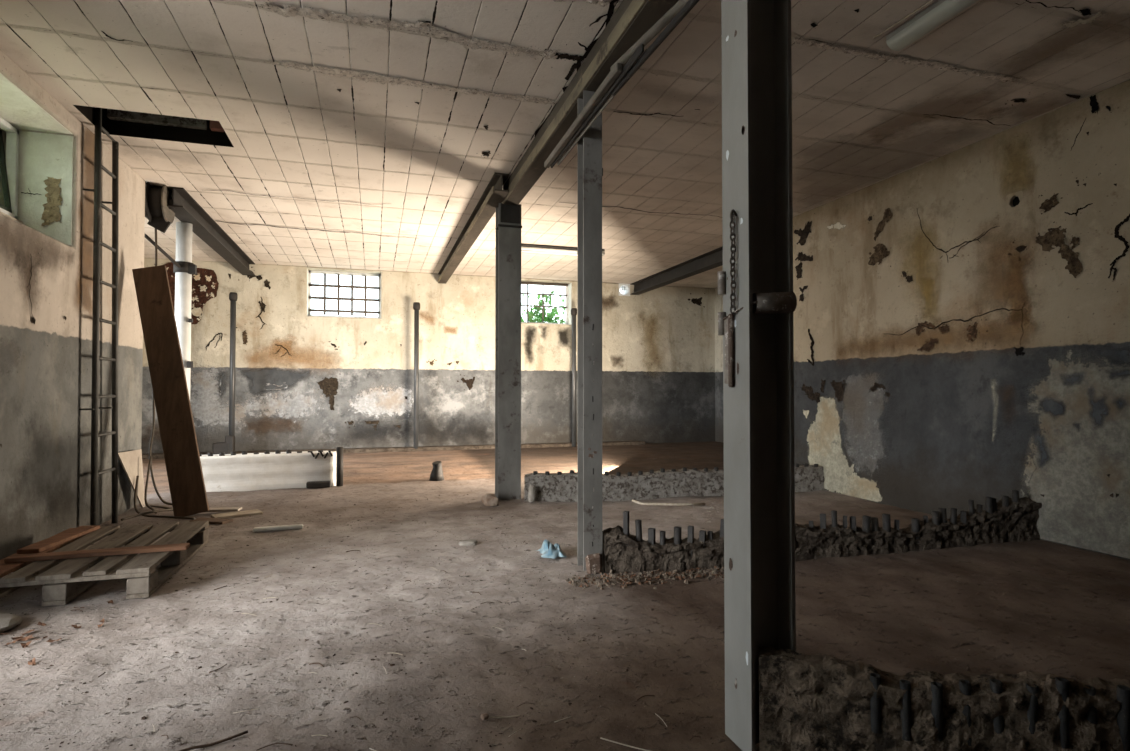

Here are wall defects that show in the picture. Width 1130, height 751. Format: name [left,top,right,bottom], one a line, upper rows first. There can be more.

crack [1026,0,1079,12]
crack [535,0,619,136]
spalling [41,177,62,226]
spalling [793,213,815,301]
crack [917,210,998,260]
spalling [1006,178,1093,278]
crack [1108,214,1130,280]
spalling [191,267,271,324]
crack [892,302,1025,345]
peeling [190,368,414,430]
peeling [802,373,890,502]
peeling [1020,349,1130,559]